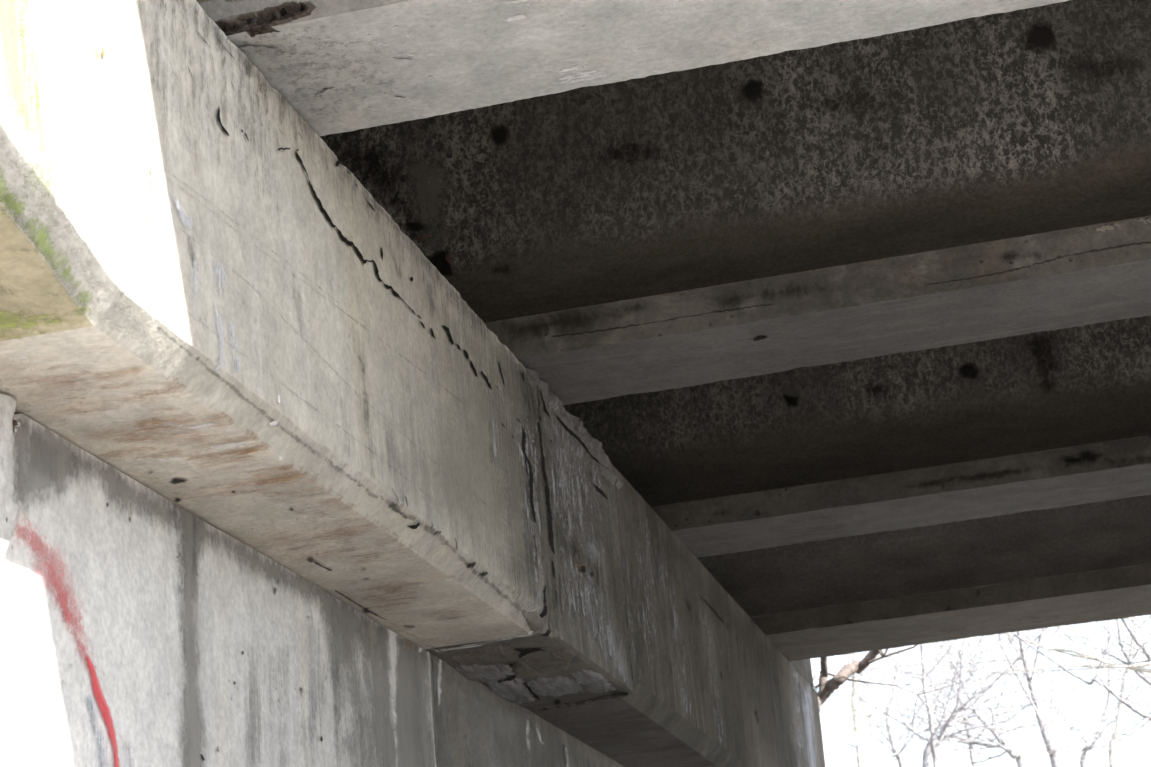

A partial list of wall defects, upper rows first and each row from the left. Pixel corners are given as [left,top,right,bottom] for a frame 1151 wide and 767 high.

spalling [214,0,316,37]
crack [197,30,260,141]
crack [927,241,1151,285]
crack [552,304,772,337]
crack [278,131,608,620]
water stain [14,419,542,767]
water stain [516,402,691,714]
peeling [455,664,616,704]
crack [497,649,628,710]
water stain [793,673,817,767]